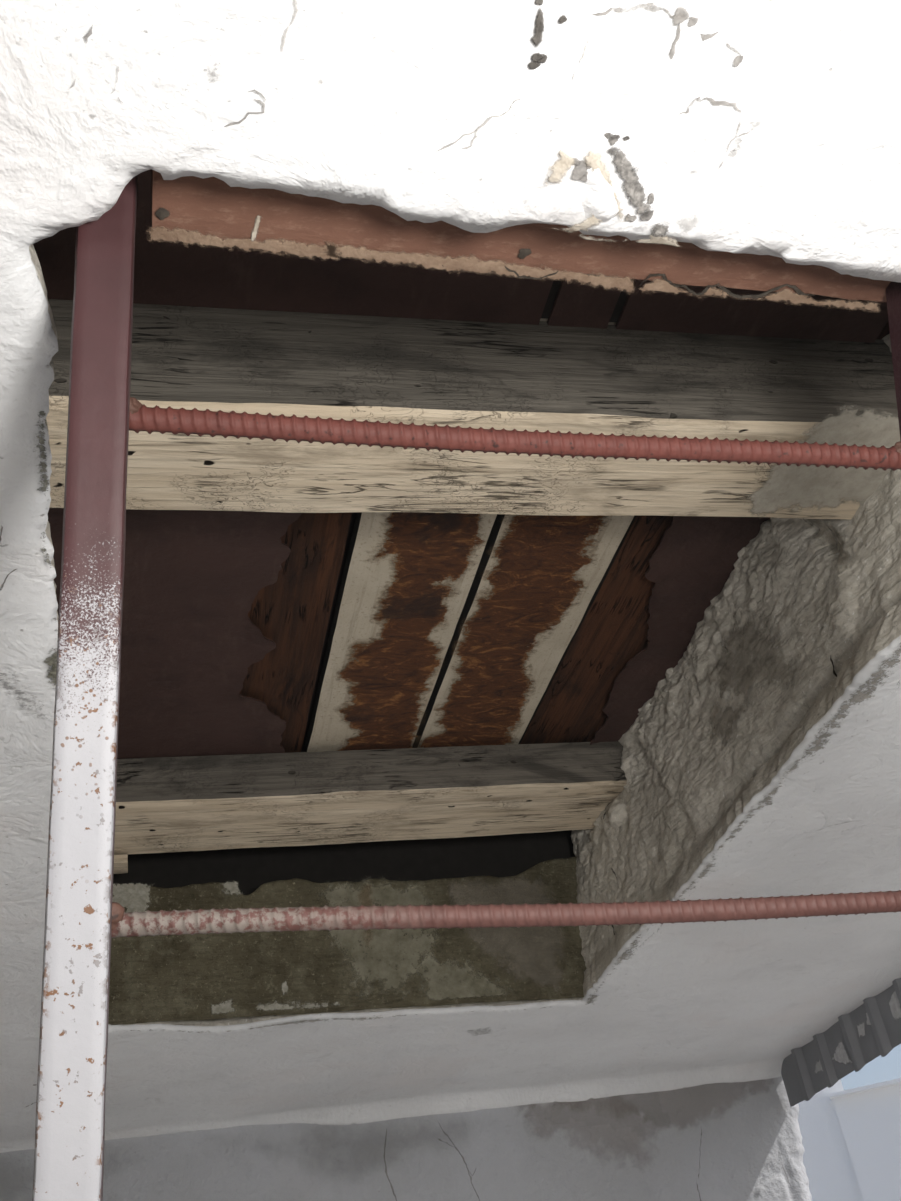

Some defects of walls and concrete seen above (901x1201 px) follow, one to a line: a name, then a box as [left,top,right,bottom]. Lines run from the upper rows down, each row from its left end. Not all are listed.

crack [572,3,743,80]
crack [678,97,750,168]
spalling [545,132,680,247]
peeling [147,226,880,312]
spalling [36,411,49,500]
spalling [44,648,57,685]
peeling [337,512,606,751]
crack [384,1132,397,1201]
crack [439,1123,480,1201]